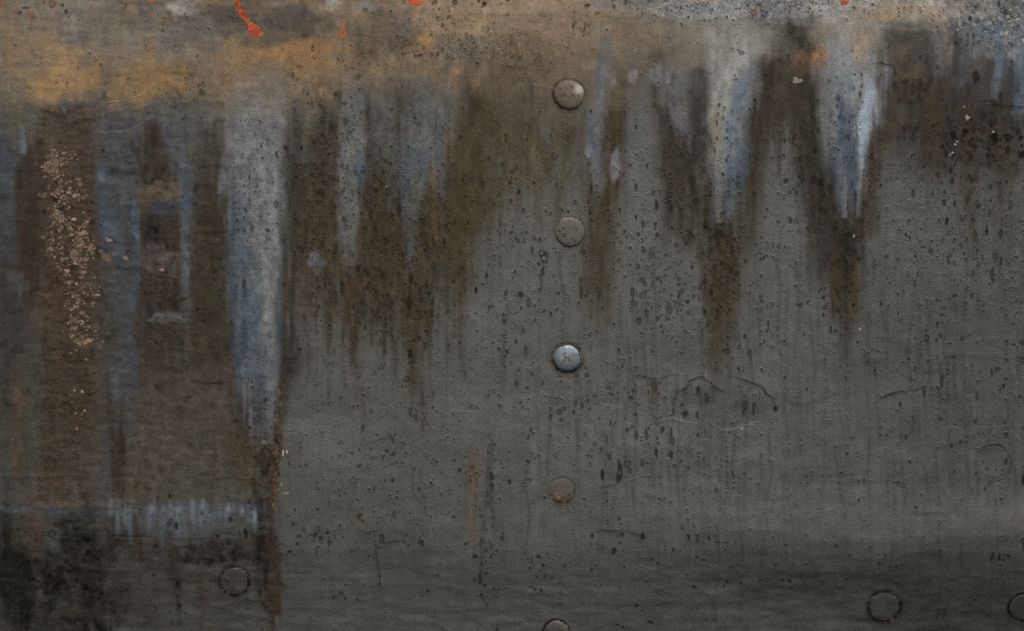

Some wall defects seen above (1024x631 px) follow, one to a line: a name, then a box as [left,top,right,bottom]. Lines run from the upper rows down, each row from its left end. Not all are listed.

rust [0,64,325,513]
damp [0,0,1024,458]
rust [252,8,1024,452]